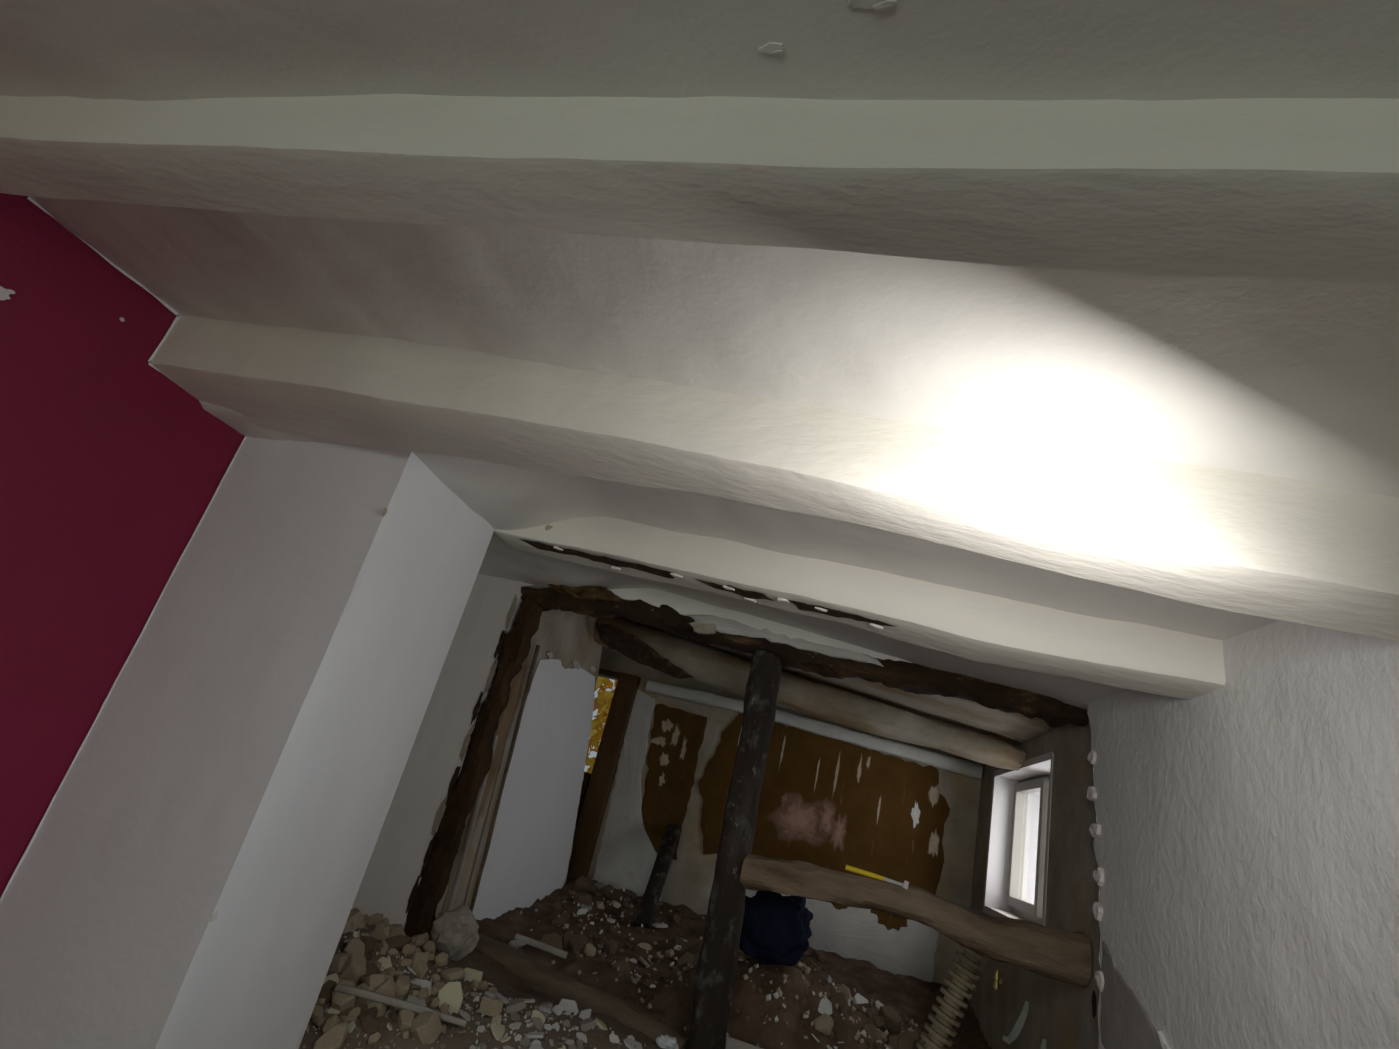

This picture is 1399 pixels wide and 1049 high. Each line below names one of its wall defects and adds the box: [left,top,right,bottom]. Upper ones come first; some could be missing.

peeling [0,286,15,300]
spalling [518,525,897,629]
spalling [595,623,693,679]
peeling [687,615,884,667]
peeling [406,594,517,914]
peeling [472,652,596,920]
peeling [592,690,743,901]
peeling [751,722,950,894]
peeling [1087,786,1097,801]
peeling [746,889,939,982]
peeling [1092,868,1104,921]
spalling [1092,940,1171,1049]